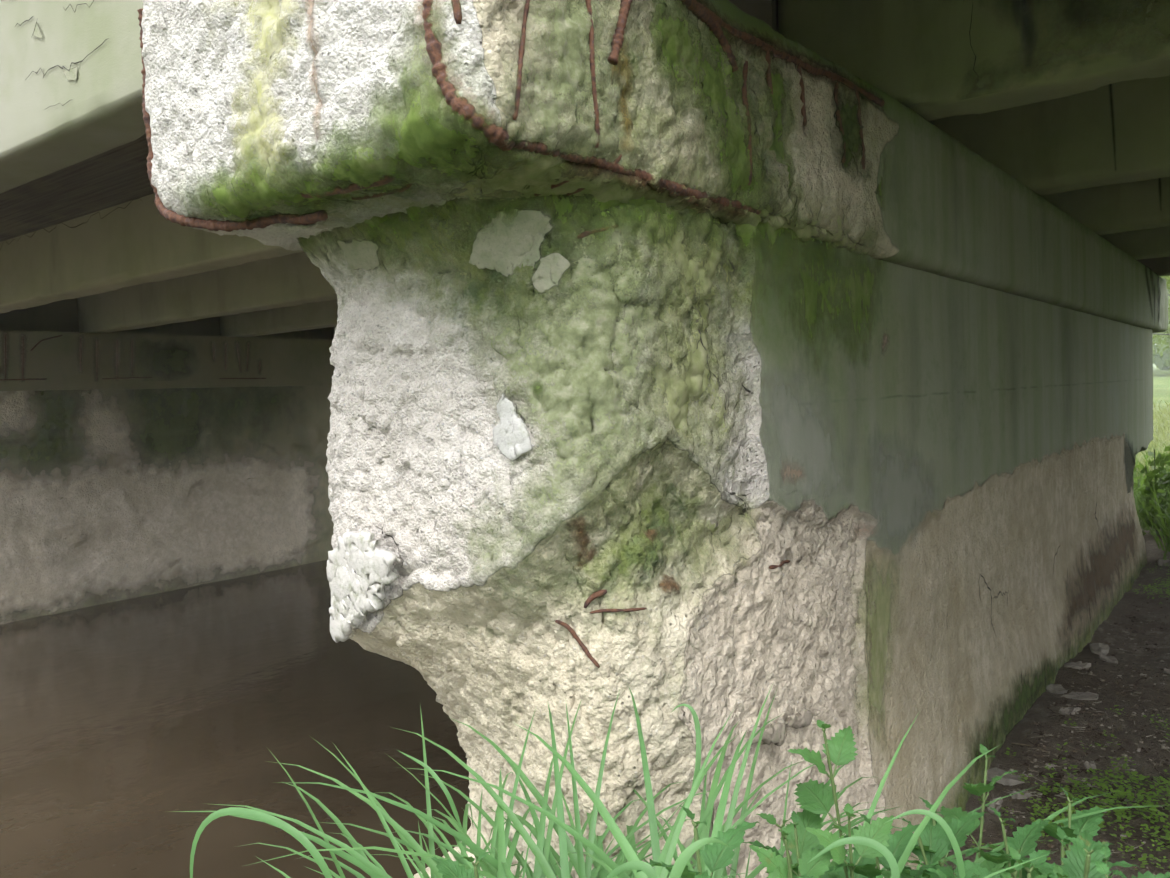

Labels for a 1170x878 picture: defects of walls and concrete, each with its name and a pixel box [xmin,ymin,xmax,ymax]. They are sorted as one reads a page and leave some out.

crack [16,0,94,35]
crack [25,38,109,80]
corrosion [306,0,322,139]
corrosion [612,46,633,147]
spalling [432,0,899,259]
spalling [141,0,769,633]
spalling [0,389,320,623]
corrosion [574,518,595,565]
corrosion [659,575,680,591]
water stain [1064,512,1135,648]
spalling [349,433,1147,878]